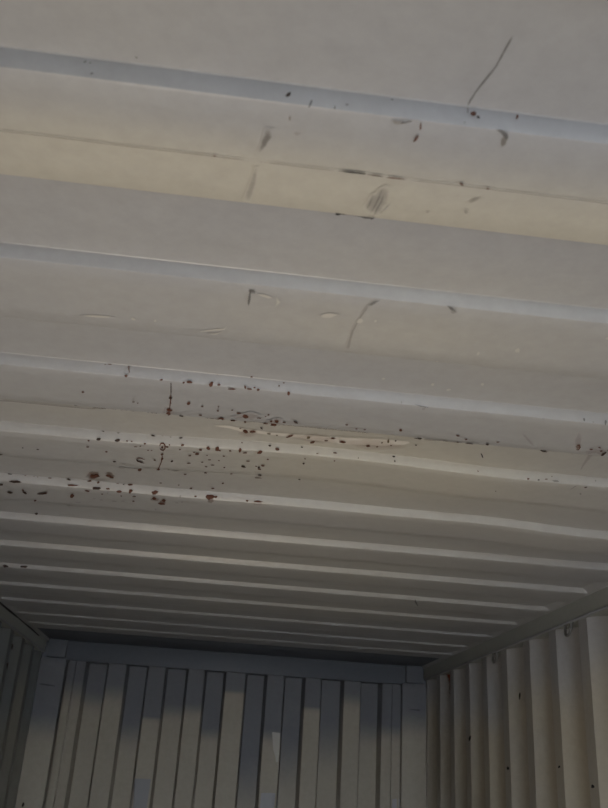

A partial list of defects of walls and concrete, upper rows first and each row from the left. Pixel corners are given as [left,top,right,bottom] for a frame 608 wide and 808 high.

rust [217,406,298,429]
rust [113,435,187,475]
rust [187,442,279,476]
rust [65,474,136,506]